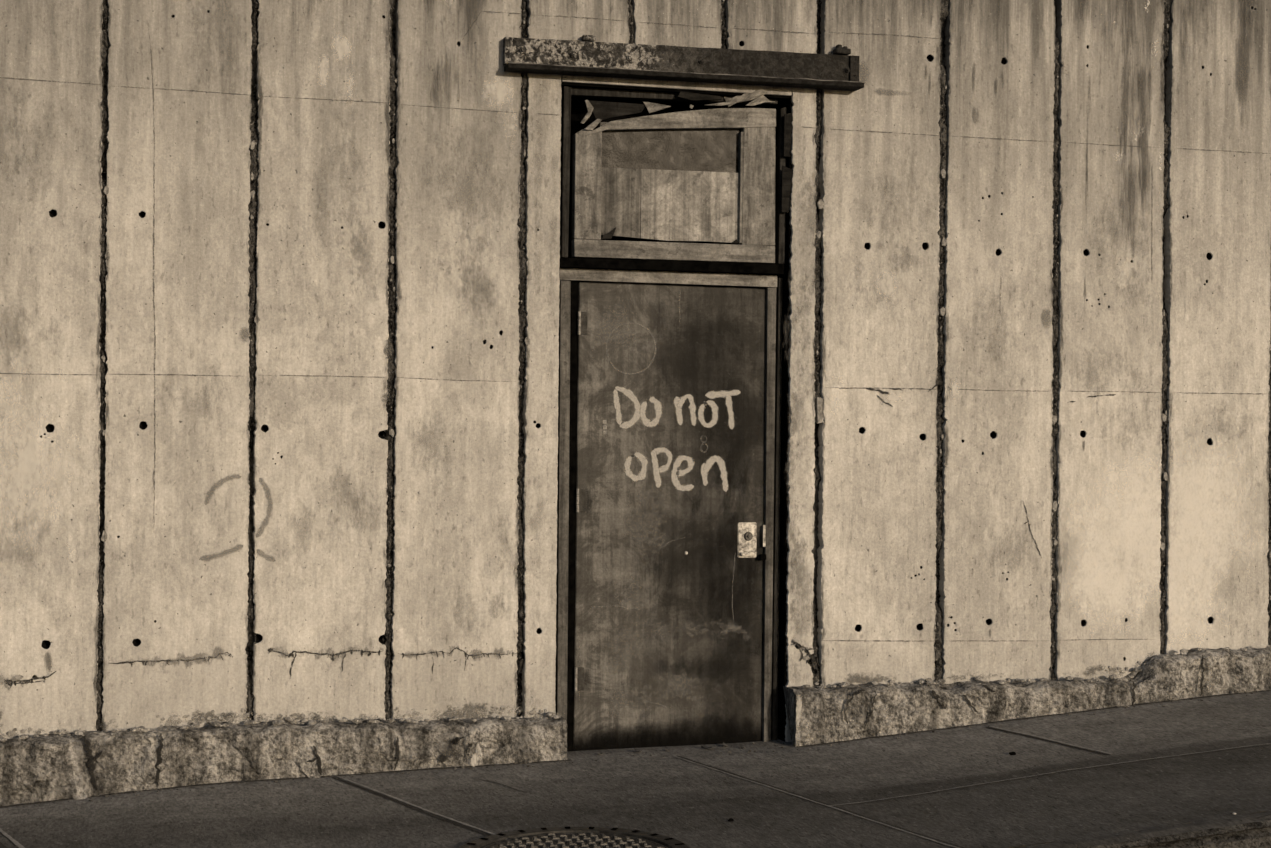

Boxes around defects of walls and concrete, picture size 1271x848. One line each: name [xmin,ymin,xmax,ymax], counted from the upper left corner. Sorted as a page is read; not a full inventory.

damp [1237,39,1248,95]
damp [1120,0,1151,226]
crack [1023,502,1042,558]
crack [0,671,56,687]
crack [110,652,231,666]
crack [268,647,513,677]